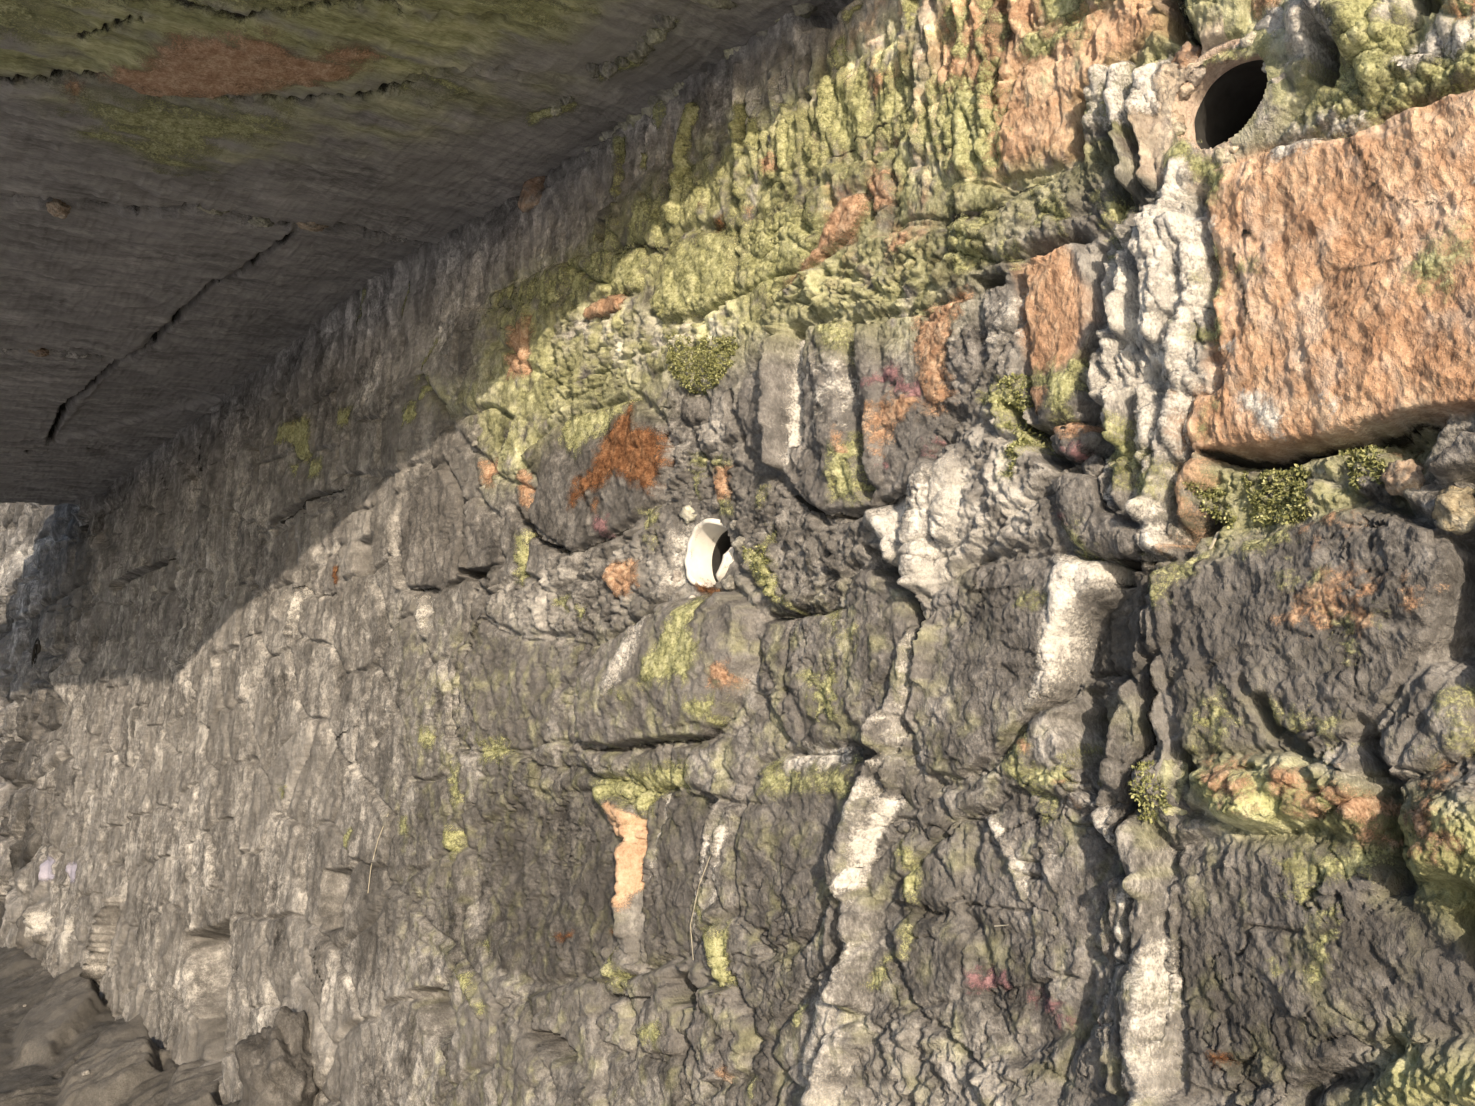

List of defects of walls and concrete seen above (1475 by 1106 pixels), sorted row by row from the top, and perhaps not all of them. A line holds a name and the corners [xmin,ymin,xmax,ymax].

crack [251,221,292,264]
crack [145,310,179,345]
crack [24,369,105,453]